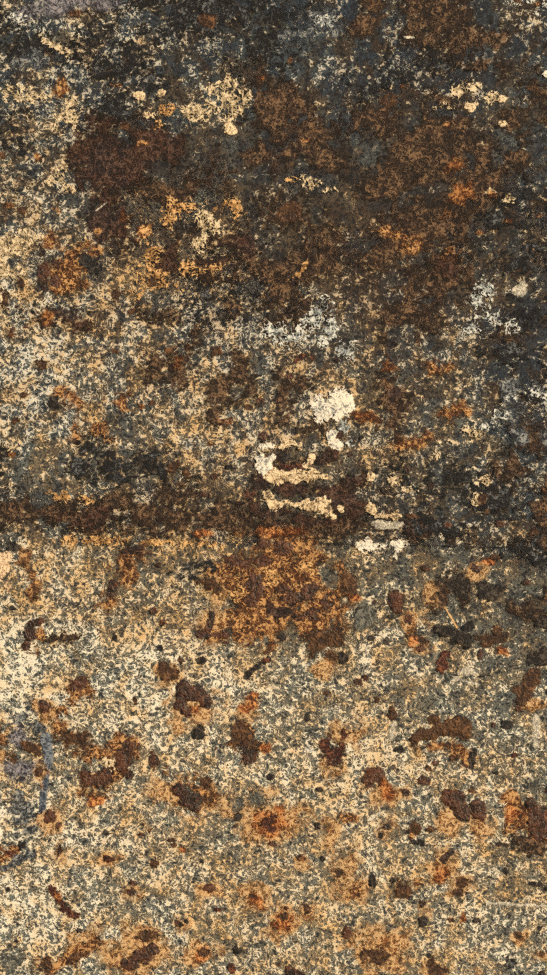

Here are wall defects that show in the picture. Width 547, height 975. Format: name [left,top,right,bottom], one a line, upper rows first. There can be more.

rust [0,0,547,695]
rust [153,645,219,740]
rust [374,696,398,721]
rust [491,646,547,730]
rust [0,675,377,904]
rust [361,714,478,806]
rust [389,786,547,928]
rust [33,885,170,975]
rust [183,941,243,974]
rust [237,881,315,946]
rust [276,963,306,975]
rust [338,925,449,975]